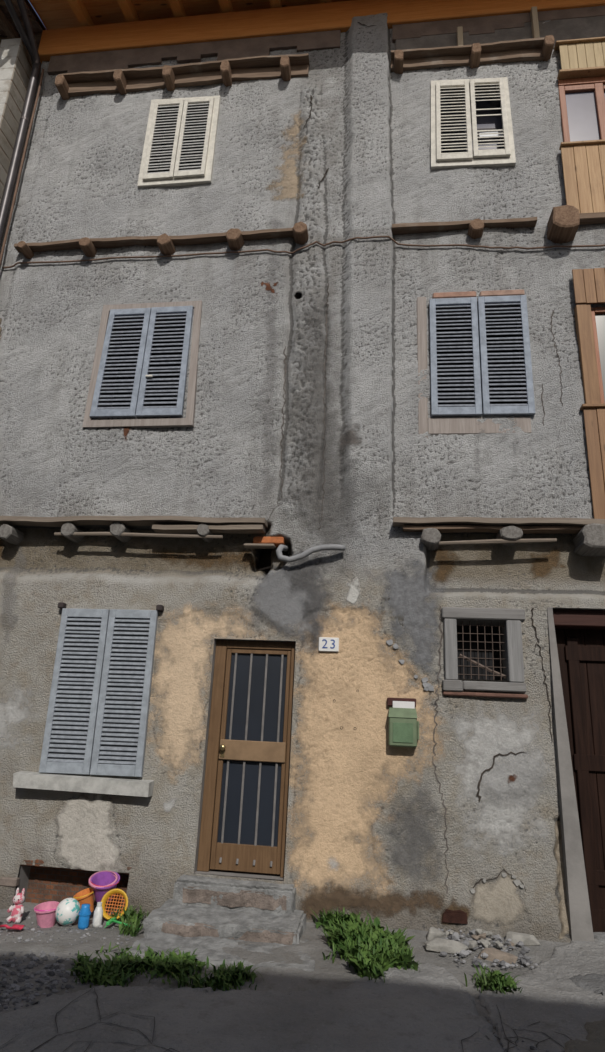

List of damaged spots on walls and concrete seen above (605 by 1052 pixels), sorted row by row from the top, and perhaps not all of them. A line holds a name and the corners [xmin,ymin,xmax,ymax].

damp [379,549,456,672]
crack [531,608,553,741]
crack [432,606,449,893]
crack [476,752,526,802]
damp [302,887,442,918]
flaking render [442,872,524,925]
crack [486,1021,572,1052]